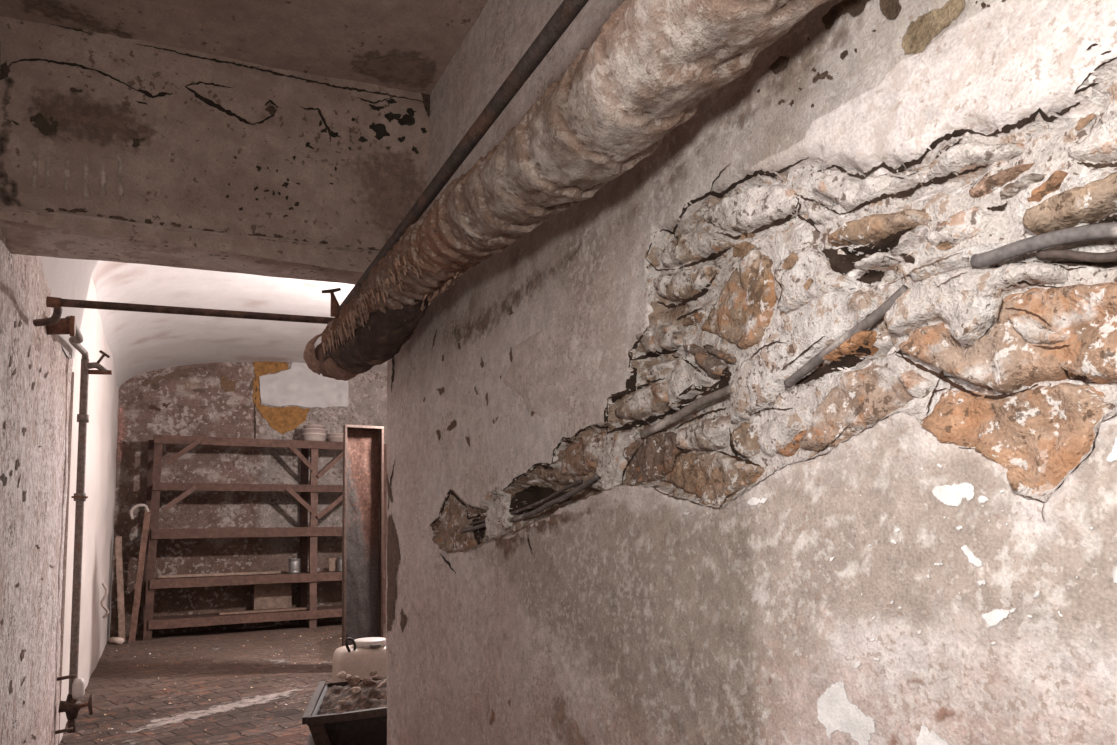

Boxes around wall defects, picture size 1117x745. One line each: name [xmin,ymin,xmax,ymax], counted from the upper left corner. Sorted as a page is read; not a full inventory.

peeling [822,0,901,29]
peeling [902,0,1005,55]
crack [0,43,430,142]
flaking render [429,56,1117,553]
flaking render [220,361,310,434]
peeling [0,459,27,501]
peeling [982,608,1032,628]